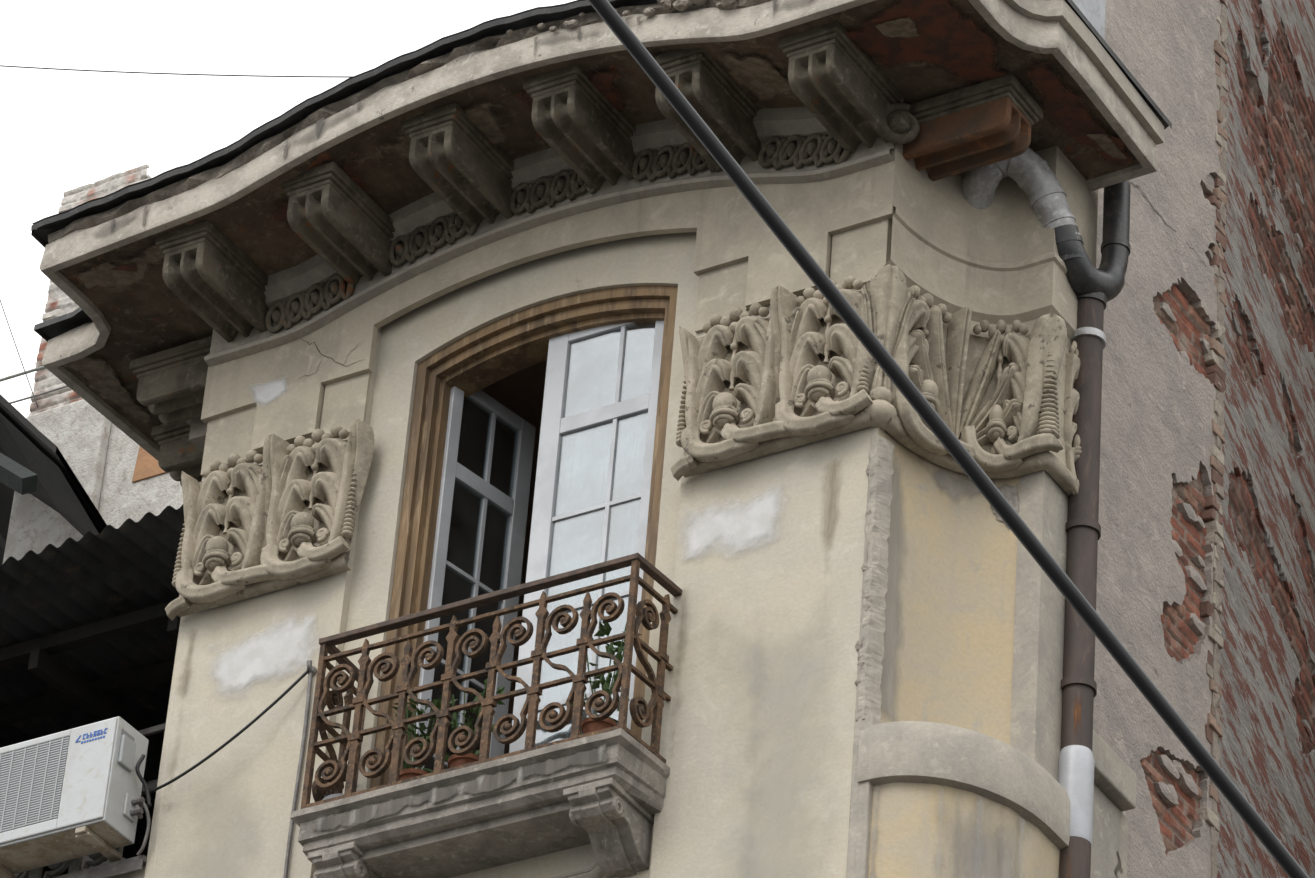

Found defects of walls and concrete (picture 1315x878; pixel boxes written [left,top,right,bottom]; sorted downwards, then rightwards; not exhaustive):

flaking render [1153,0,1315,765]
flaking render [1140,748,1220,878]